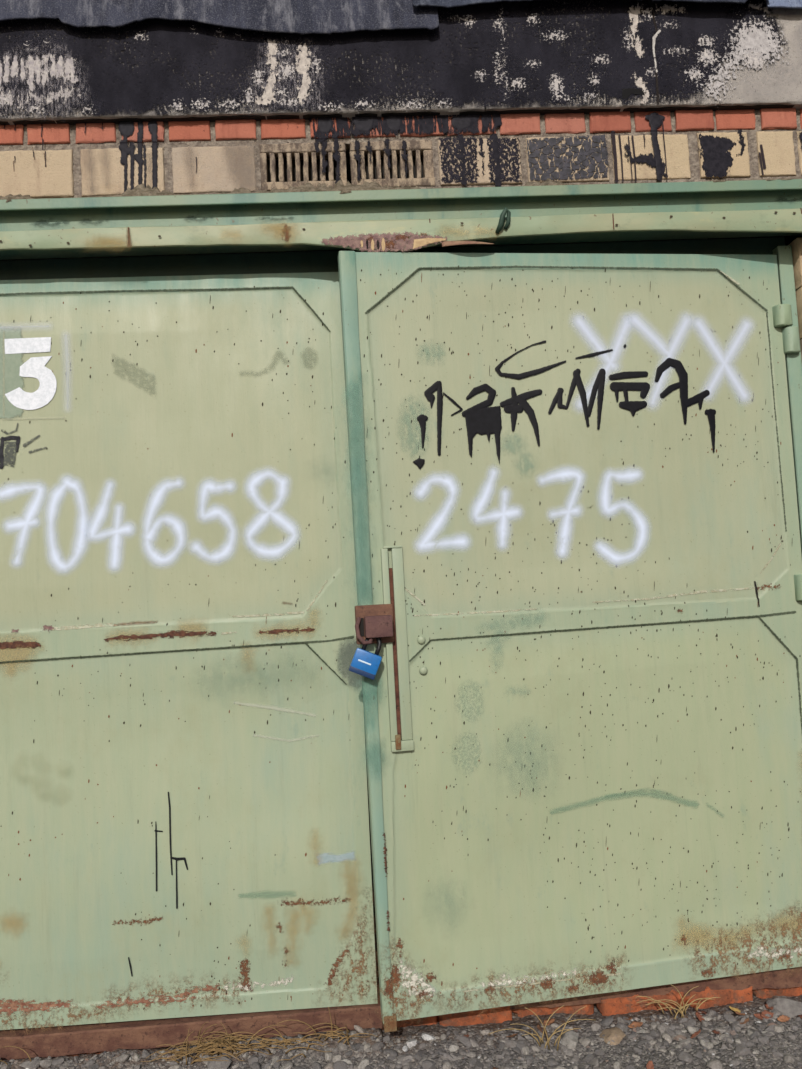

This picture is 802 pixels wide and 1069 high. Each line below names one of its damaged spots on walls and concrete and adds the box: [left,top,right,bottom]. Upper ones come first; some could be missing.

peeling [0,41,96,118]
peeling [171,39,324,115]
spalling [622,3,688,104]
peeling [664,2,791,106]
water stain [118,124,158,192]
water stain [313,132,341,183]
water stain [354,138,408,181]
water stain [611,112,668,183]
rust [104,622,217,642]
rust [0,948,294,1030]
rust [325,910,436,1024]
rust [448,961,623,1006]